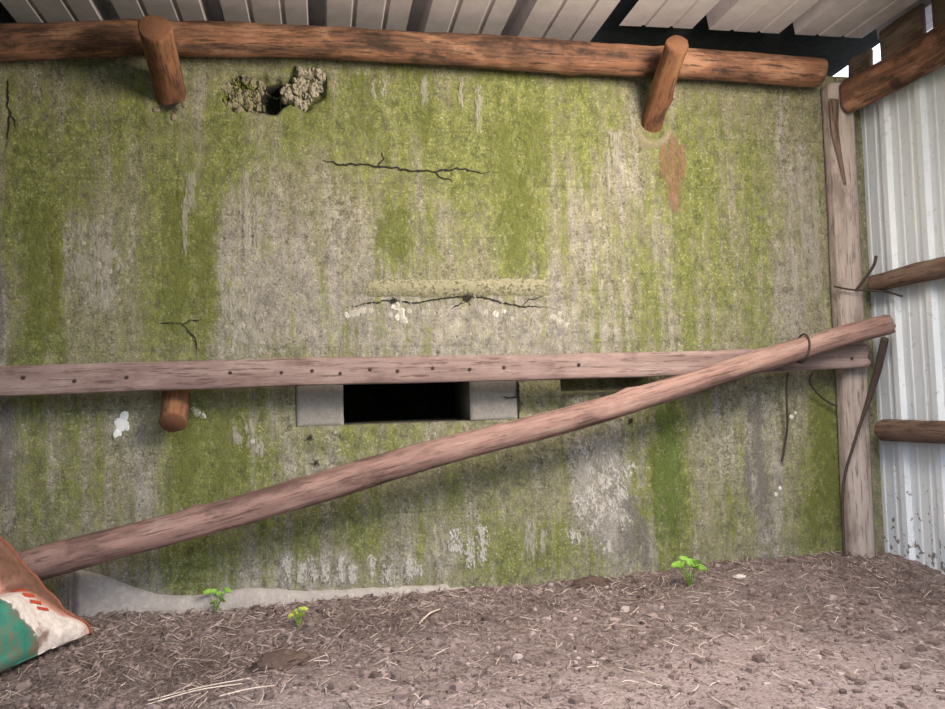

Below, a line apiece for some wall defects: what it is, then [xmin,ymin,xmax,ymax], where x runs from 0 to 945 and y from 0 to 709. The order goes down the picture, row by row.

spalling [221,65,326,115]
crack [324,154,491,181]
damp [606,132,621,190]
damp [786,154,822,309]
damp [157,172,218,342]
crack [345,296,562,310]
damp [623,401,686,564]
damp [743,398,769,532]
damp [280,551,357,585]
damp [367,555,422,584]
damp [448,524,488,568]
damp [524,521,547,556]